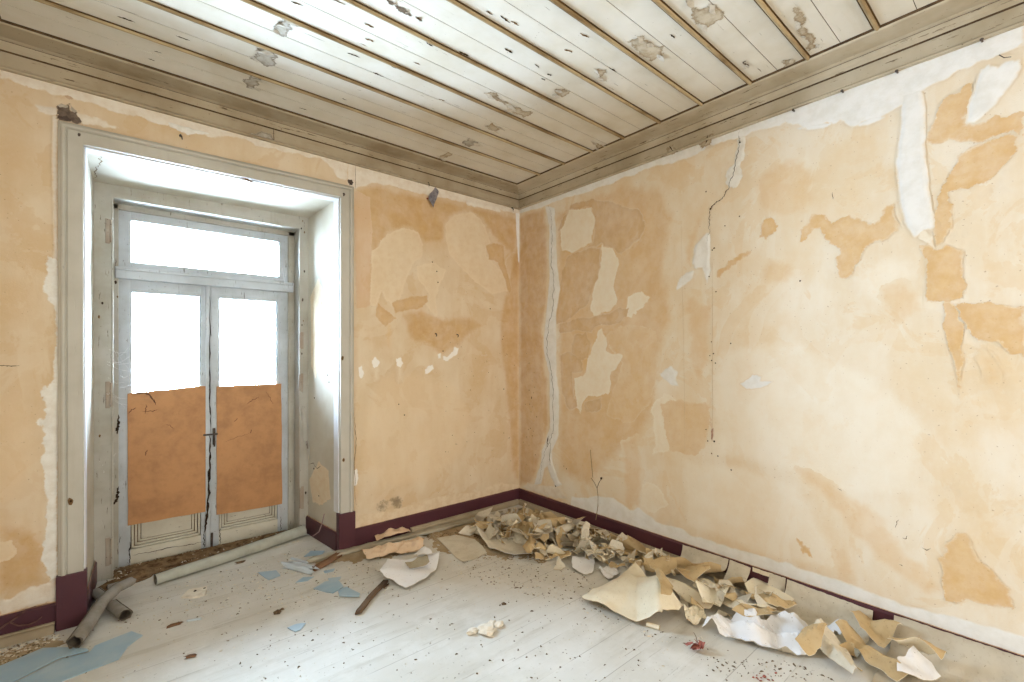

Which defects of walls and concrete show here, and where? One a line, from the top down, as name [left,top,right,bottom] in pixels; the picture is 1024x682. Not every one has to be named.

flaking render [0,26,1024,214]
peeling [686,0,724,32]
peeling [792,7,822,51]
flaking render [0,103,119,615]
crack [522,206,568,500]
flaking render [570,495,1024,655]